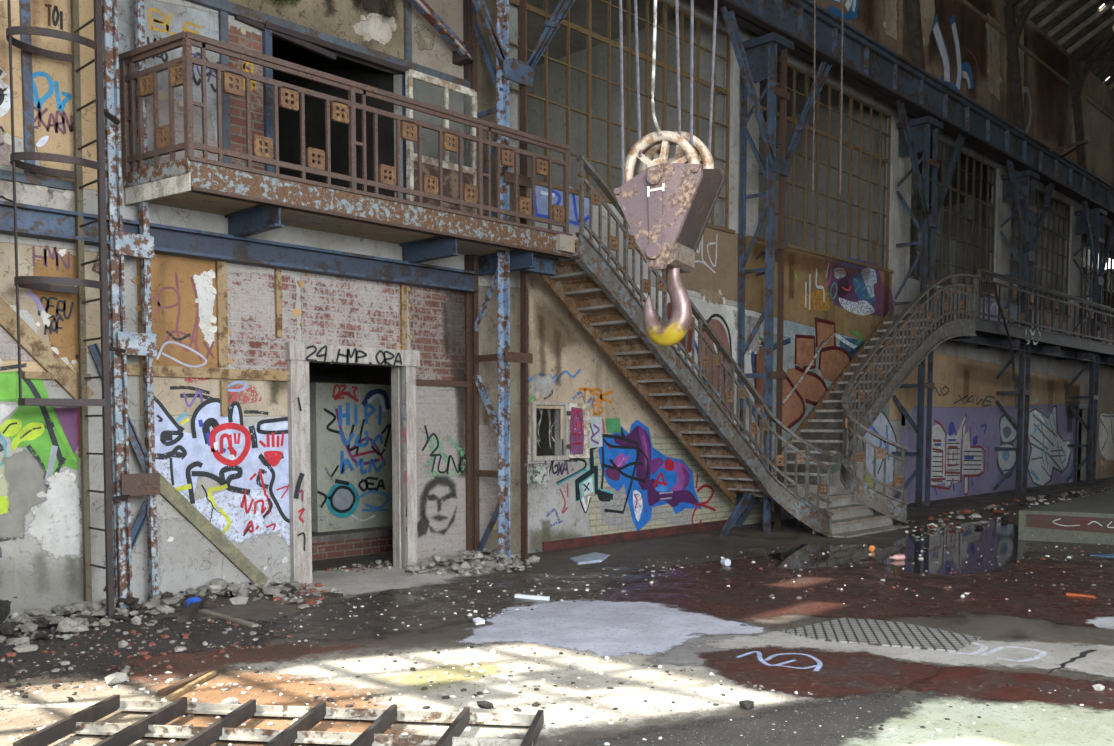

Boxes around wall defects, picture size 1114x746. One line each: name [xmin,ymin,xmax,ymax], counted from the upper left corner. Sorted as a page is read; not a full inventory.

leakage [354,0,397,19]
peeling [352,13,397,45]
flaking render [132,253,465,388]
peeling [0,449,83,560]
crack [1047,649,1098,675]